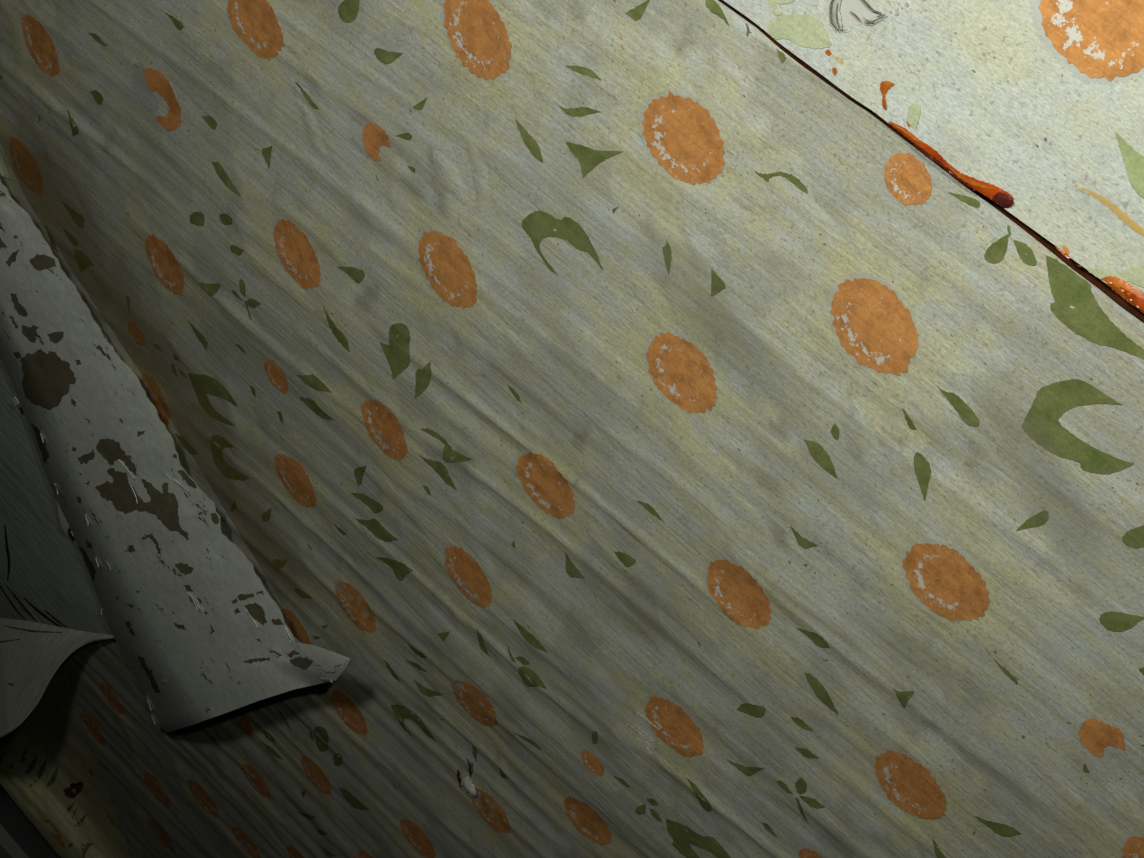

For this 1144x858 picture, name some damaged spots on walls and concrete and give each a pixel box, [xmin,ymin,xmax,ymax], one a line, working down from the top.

crack [718,0,1144,323]
corrosion [880,81,1014,207]
peeling [0,178,352,738]